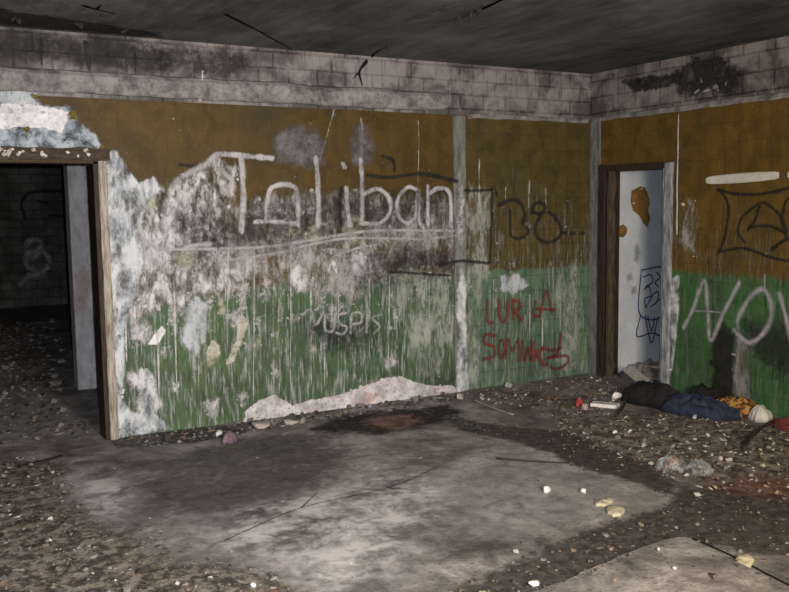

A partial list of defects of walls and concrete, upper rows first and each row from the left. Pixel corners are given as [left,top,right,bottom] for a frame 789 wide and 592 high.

crack [458,0,503,24]
crack [223,14,293,51]
peeling [0,91,494,438]
peeling [500,273,528,294]